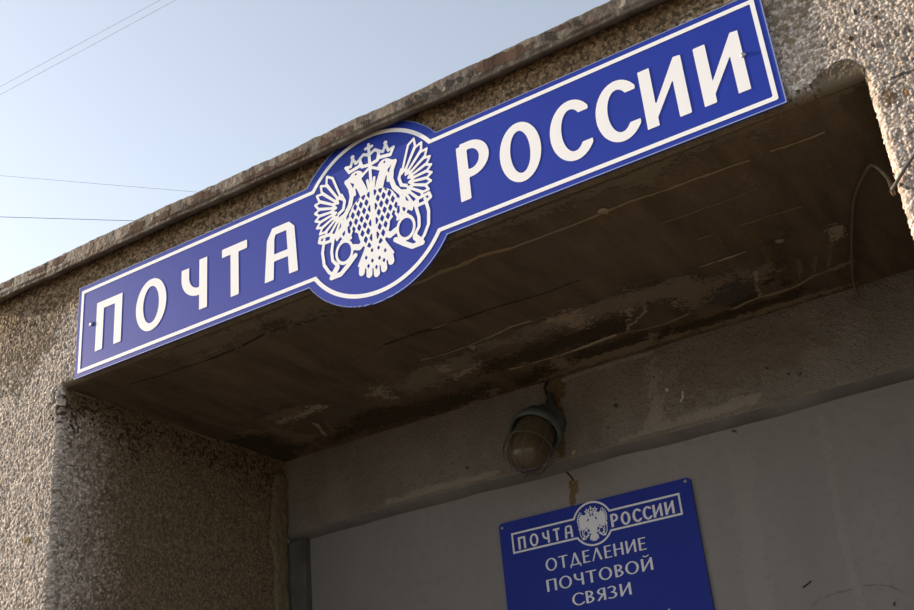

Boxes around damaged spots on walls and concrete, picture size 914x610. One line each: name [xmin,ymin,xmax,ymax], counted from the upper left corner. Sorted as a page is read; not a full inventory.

damp [50,223,855,499]
crack [384,280,580,361]